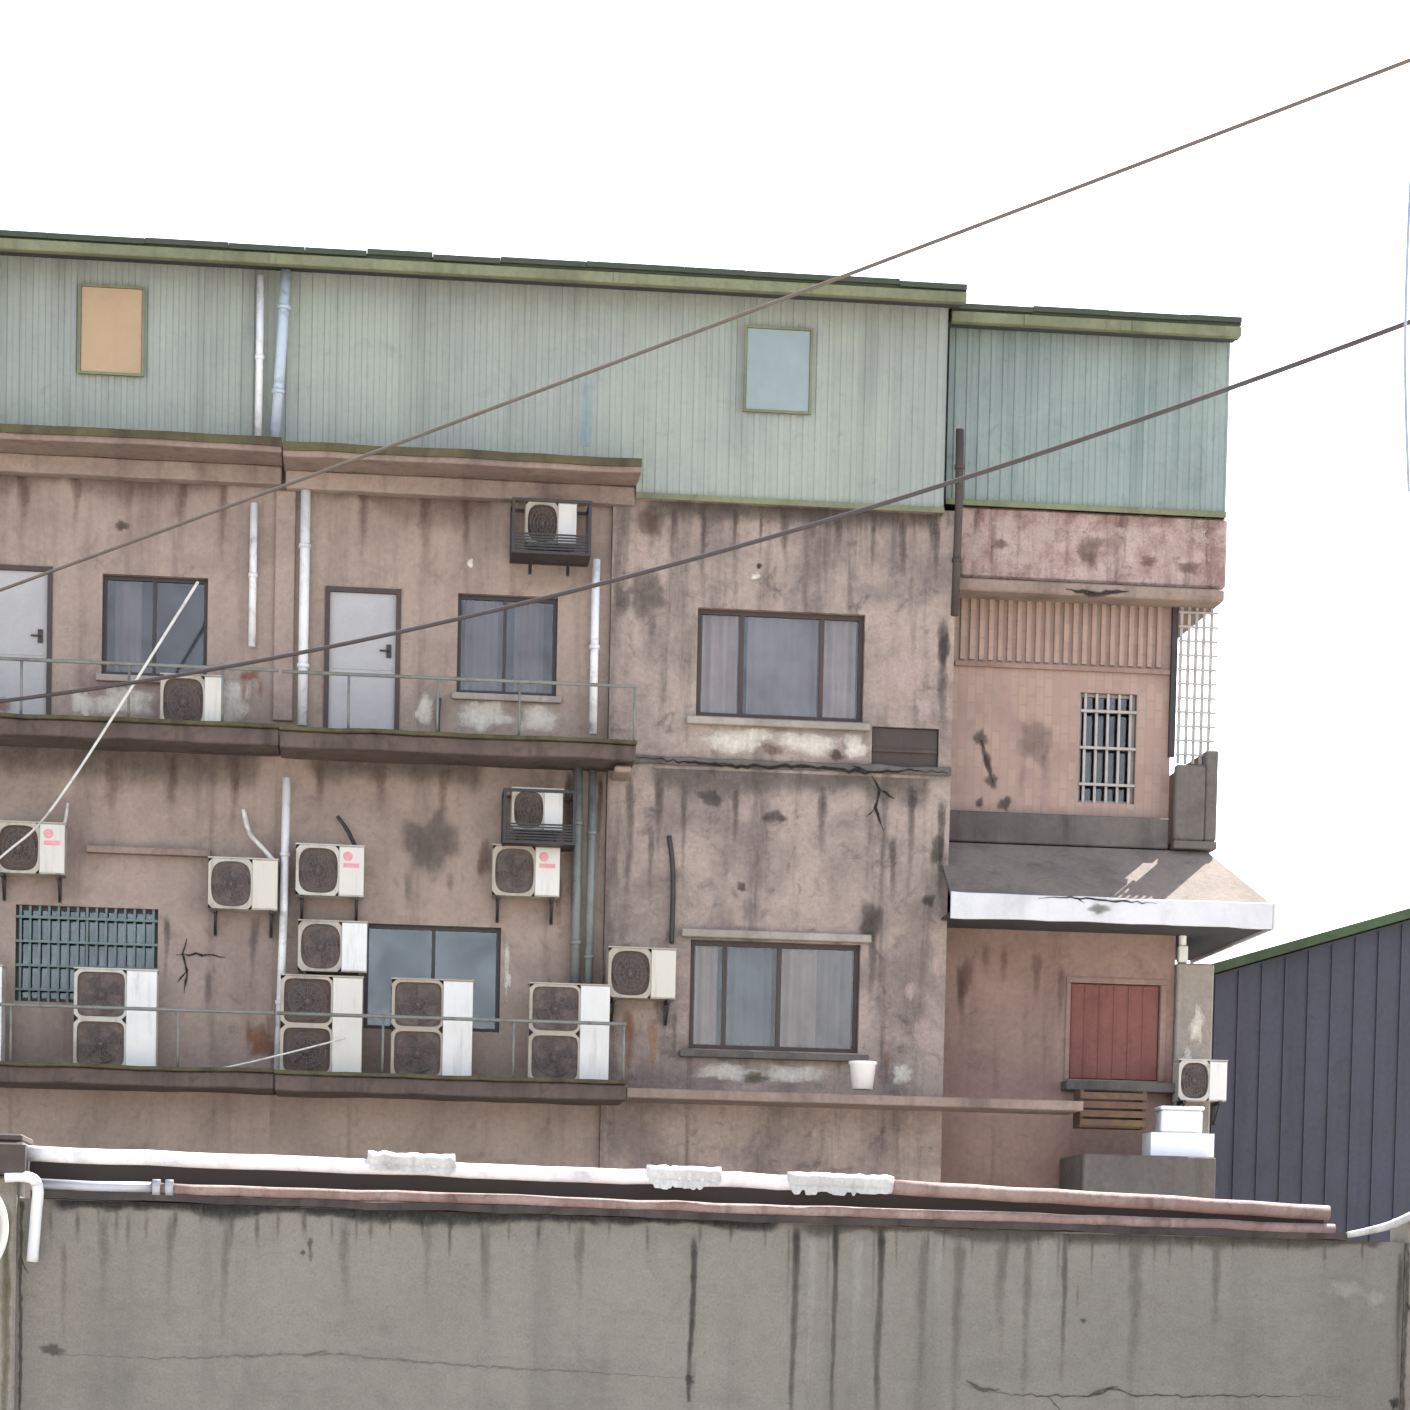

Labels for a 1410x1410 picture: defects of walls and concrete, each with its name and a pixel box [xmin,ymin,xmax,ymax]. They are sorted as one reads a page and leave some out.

peeling [415,697,432,723]
peeling [461,701,556,731]
peeling [703,729,866,760]
water stain [658,768,922,812]
crack [636,757,948,831]
water stain [976,733,1010,808]
water stain [932,812,943,863]
water stain [862,909,878,949]
crack [177,938,225,992]
water stain [686,1243,697,1402]
crack [964,1380,1338,1410]